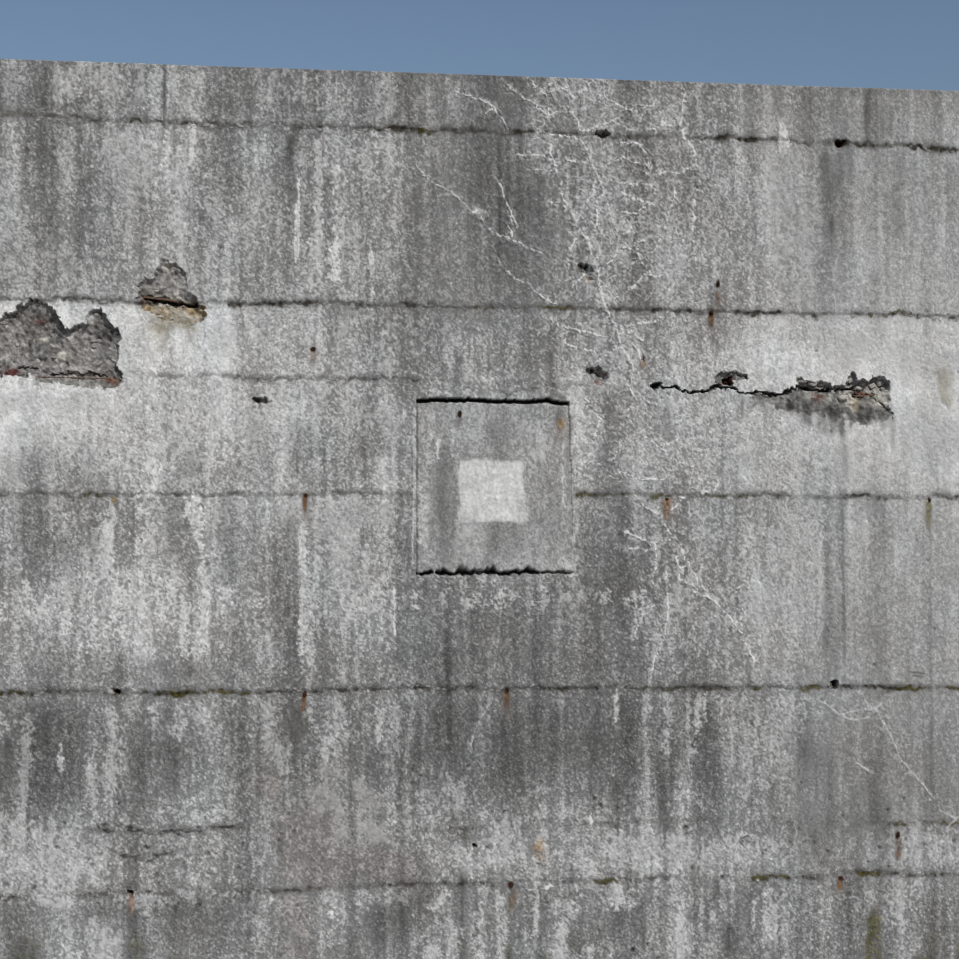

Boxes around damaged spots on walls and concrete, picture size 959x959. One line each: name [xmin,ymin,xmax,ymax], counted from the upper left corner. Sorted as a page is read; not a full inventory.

crack [455,91,506,125]
water stain [101,122,197,247]
water stain [294,123,343,299]
crack [416,165,542,253]
spalling [0,295,125,391]
spalling [125,256,208,326]
crack [499,77,756,673]
spalling [650,368,894,428]
water stain [19,385,236,664]
water stain [283,495,396,655]
water stain [738,504,831,661]
water stain [0,813,107,908]